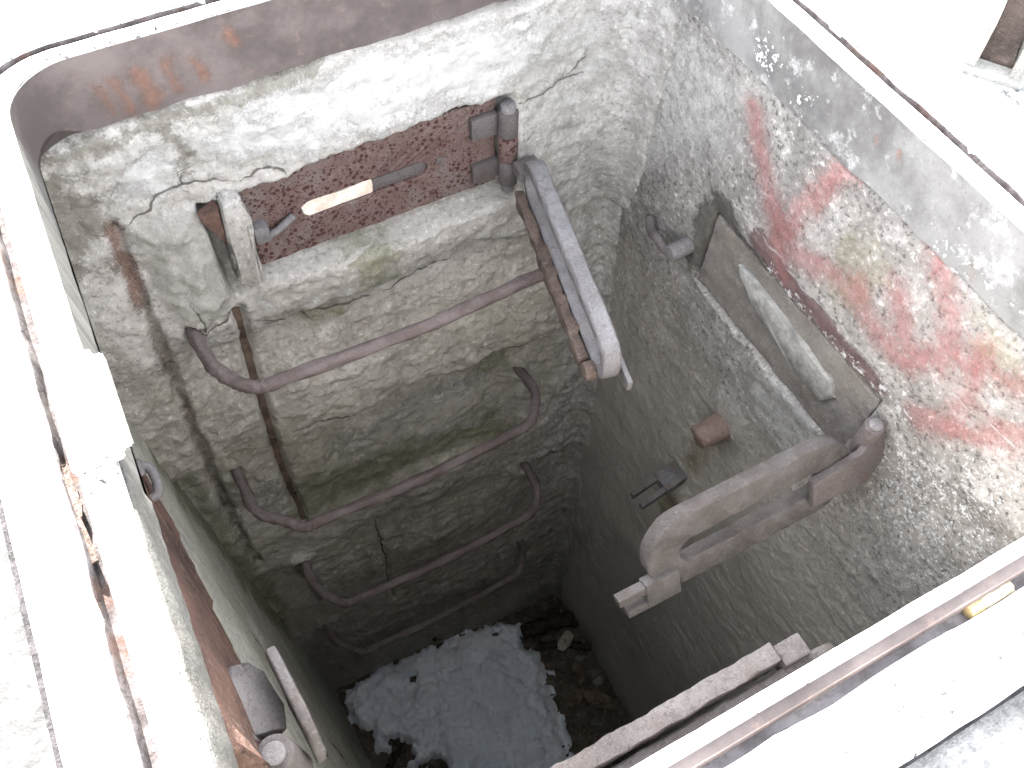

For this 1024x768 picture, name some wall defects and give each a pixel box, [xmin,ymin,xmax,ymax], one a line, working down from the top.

crack [130,166,286,224]
crack [375,519,393,593]